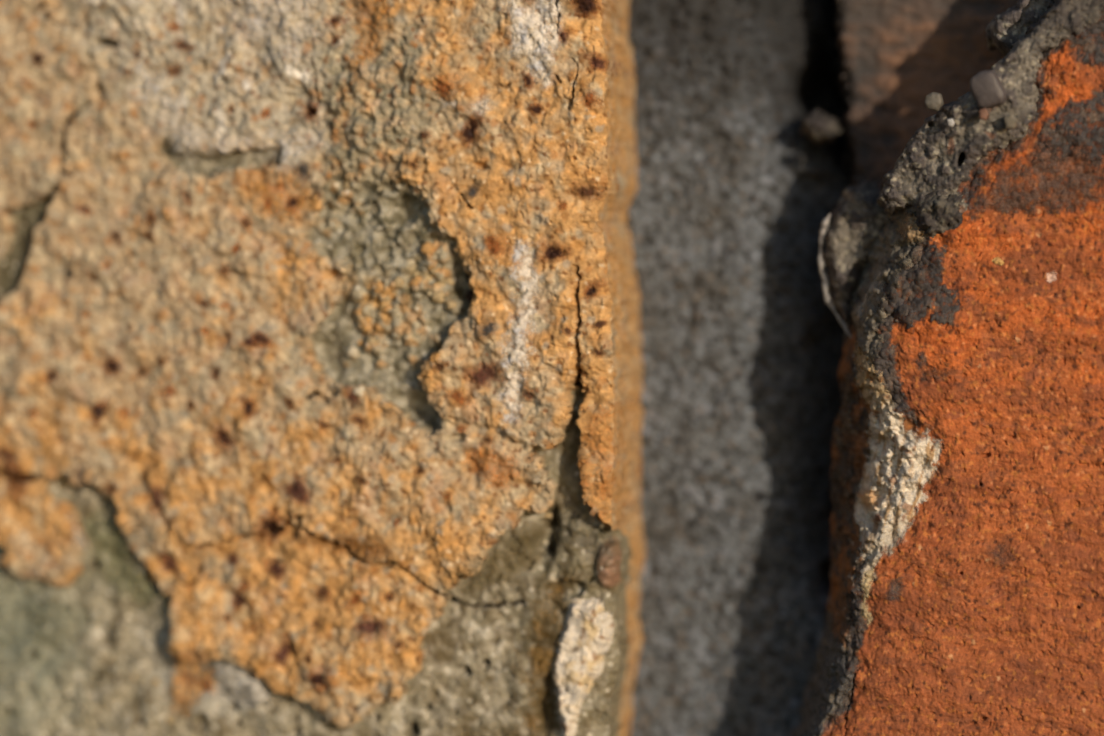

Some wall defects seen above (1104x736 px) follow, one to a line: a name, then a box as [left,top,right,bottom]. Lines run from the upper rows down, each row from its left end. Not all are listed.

spalling [158,138,282,178]
crack [574,290,582,386]
spalling [0,172,632,736]
water stain [852,347,942,624]
crack [149,560,205,585]
crack [285,509,524,608]